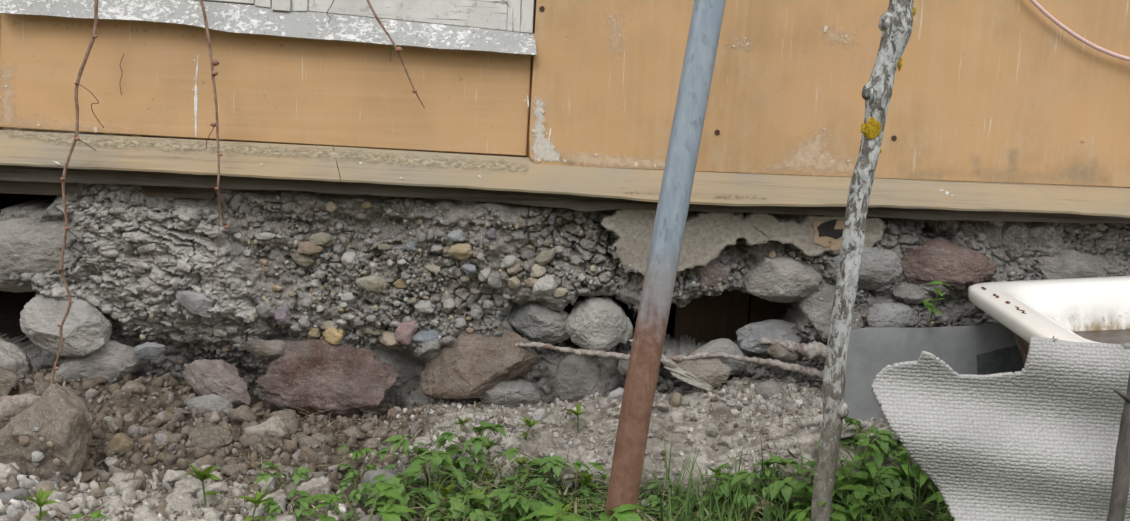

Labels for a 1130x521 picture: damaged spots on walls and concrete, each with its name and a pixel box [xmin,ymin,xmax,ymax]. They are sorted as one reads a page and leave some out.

peeling [764,128,854,174]
peeling [813,219,844,251]